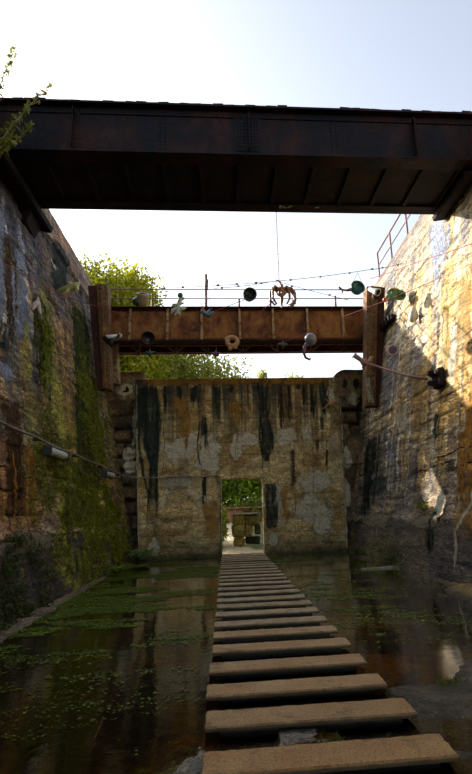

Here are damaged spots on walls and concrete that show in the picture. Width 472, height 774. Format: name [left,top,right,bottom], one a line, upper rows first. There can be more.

damp [0,210,52,385]
damp [51,240,70,293]
corrosion [442,281,472,366]
damp [132,384,208,556]
peeling [159,431,259,474]
damp [213,385,233,420]
damp [257,385,274,469]
damp [264,481,282,547]
damp [296,383,329,419]
peeling [292,469,336,535]
corrosion [453,377,472,536]